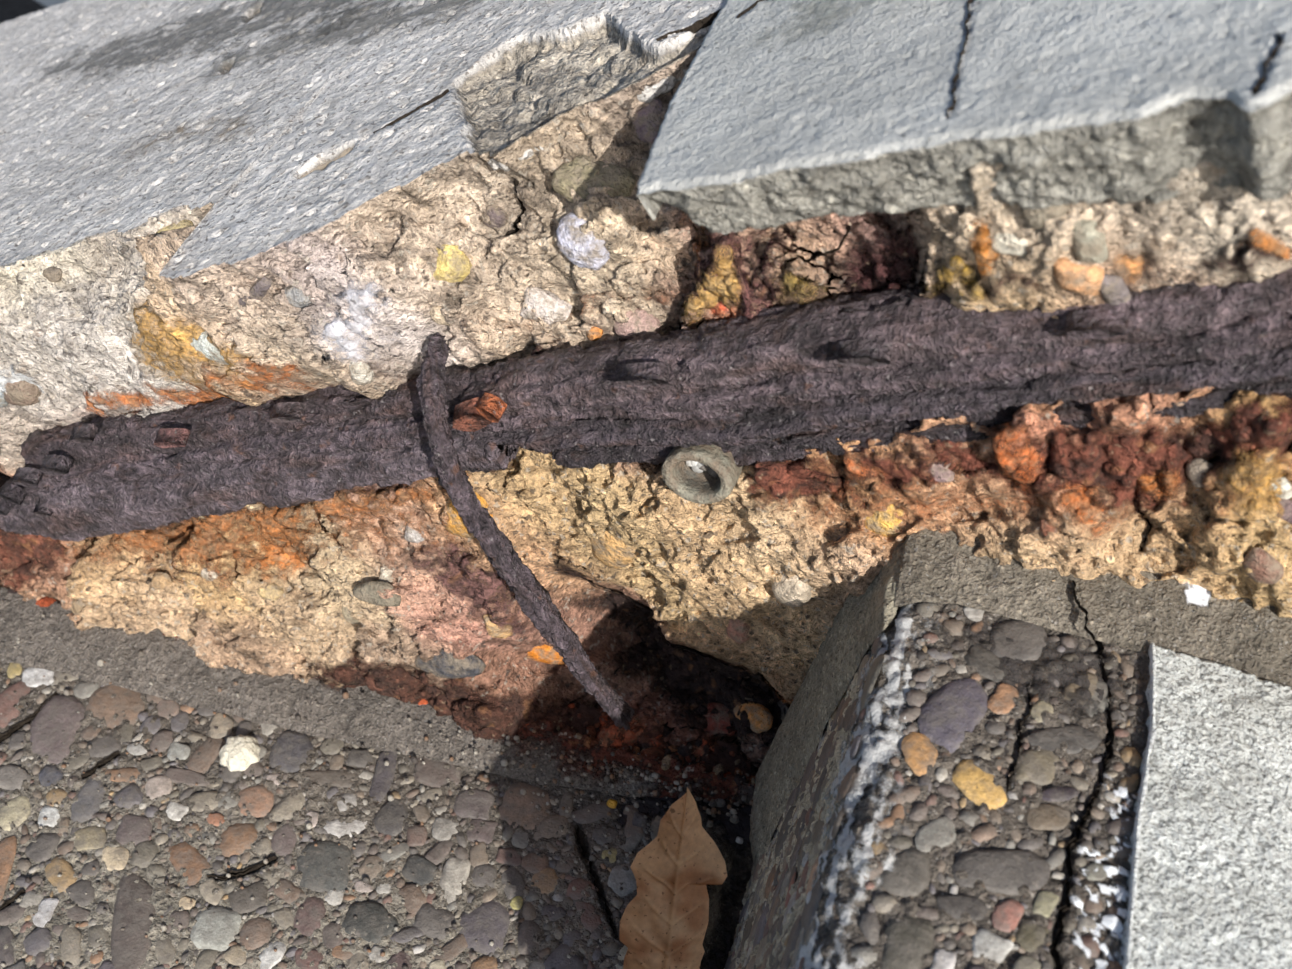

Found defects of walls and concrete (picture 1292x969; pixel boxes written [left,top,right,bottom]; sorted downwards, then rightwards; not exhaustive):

corrosion [0,301,535,636]
spalling [0,477,598,725]
crack [373,89,449,134]
corrosion [314,557,794,805]
spalling [0,23,1292,478]
crack [656,0,767,41]
damp [795,604,928,969]
corrosion [445,209,1292,532]
spalling [465,387,1292,768]
damp [947,624,1120,713]
crack [1051,580,1115,969]
crack [1252,32,1284,96]